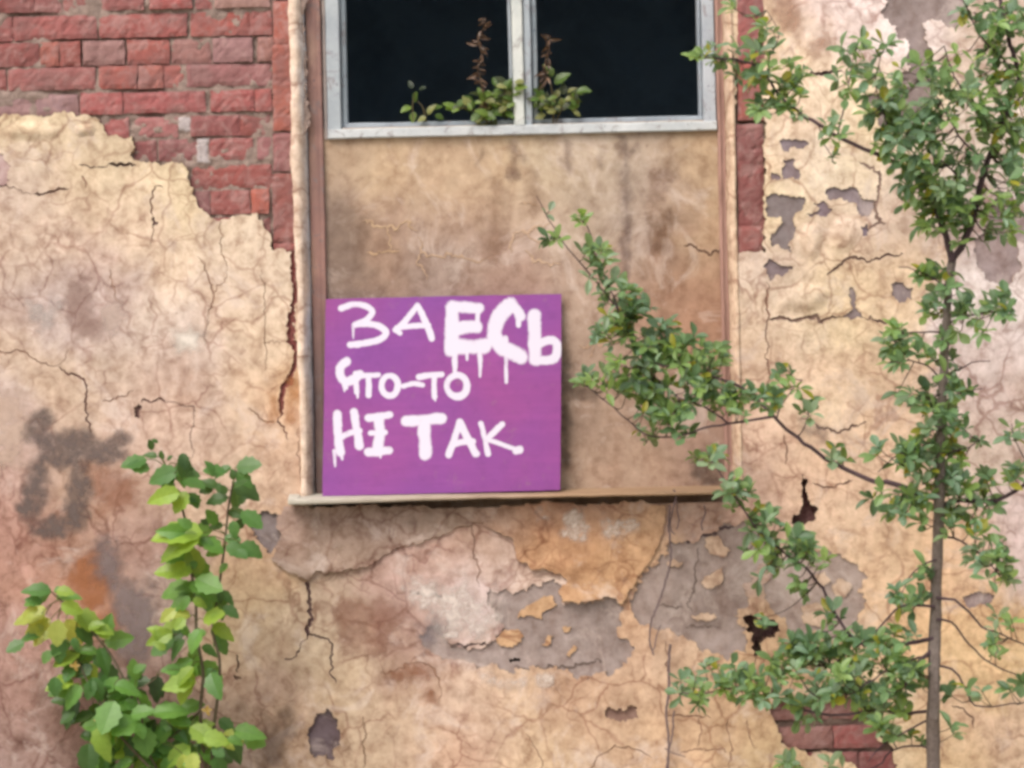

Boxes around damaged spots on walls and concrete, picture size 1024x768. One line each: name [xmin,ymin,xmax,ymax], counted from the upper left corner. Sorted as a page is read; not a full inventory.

crack [0,162,136,196]
flaking render [0,0,311,253]
flaking render [734,0,874,281]
spalling [868,0,977,127]
crack [827,253,903,276]
crack [0,349,195,458]
crack [248,250,301,481]
damp [0,397,129,538]
spalling [792,474,818,525]
crack [284,581,337,683]
flaking render [249,500,868,680]
flaking render [770,694,898,768]